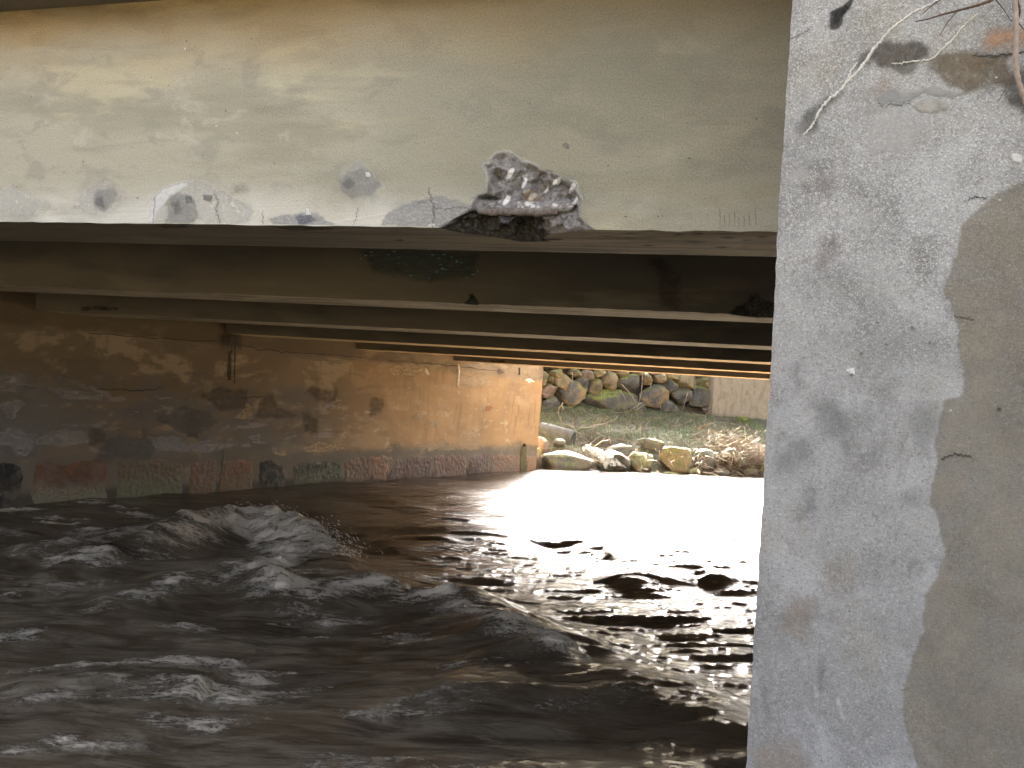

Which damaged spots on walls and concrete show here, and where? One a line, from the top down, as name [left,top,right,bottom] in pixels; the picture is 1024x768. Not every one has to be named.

damp [873,41,928,74]
damp [988,56,1024,109]
crack [415,187,466,228]
spalling [440,150,596,242]
crack [941,452,973,460]
damp [905,204,1024,768]